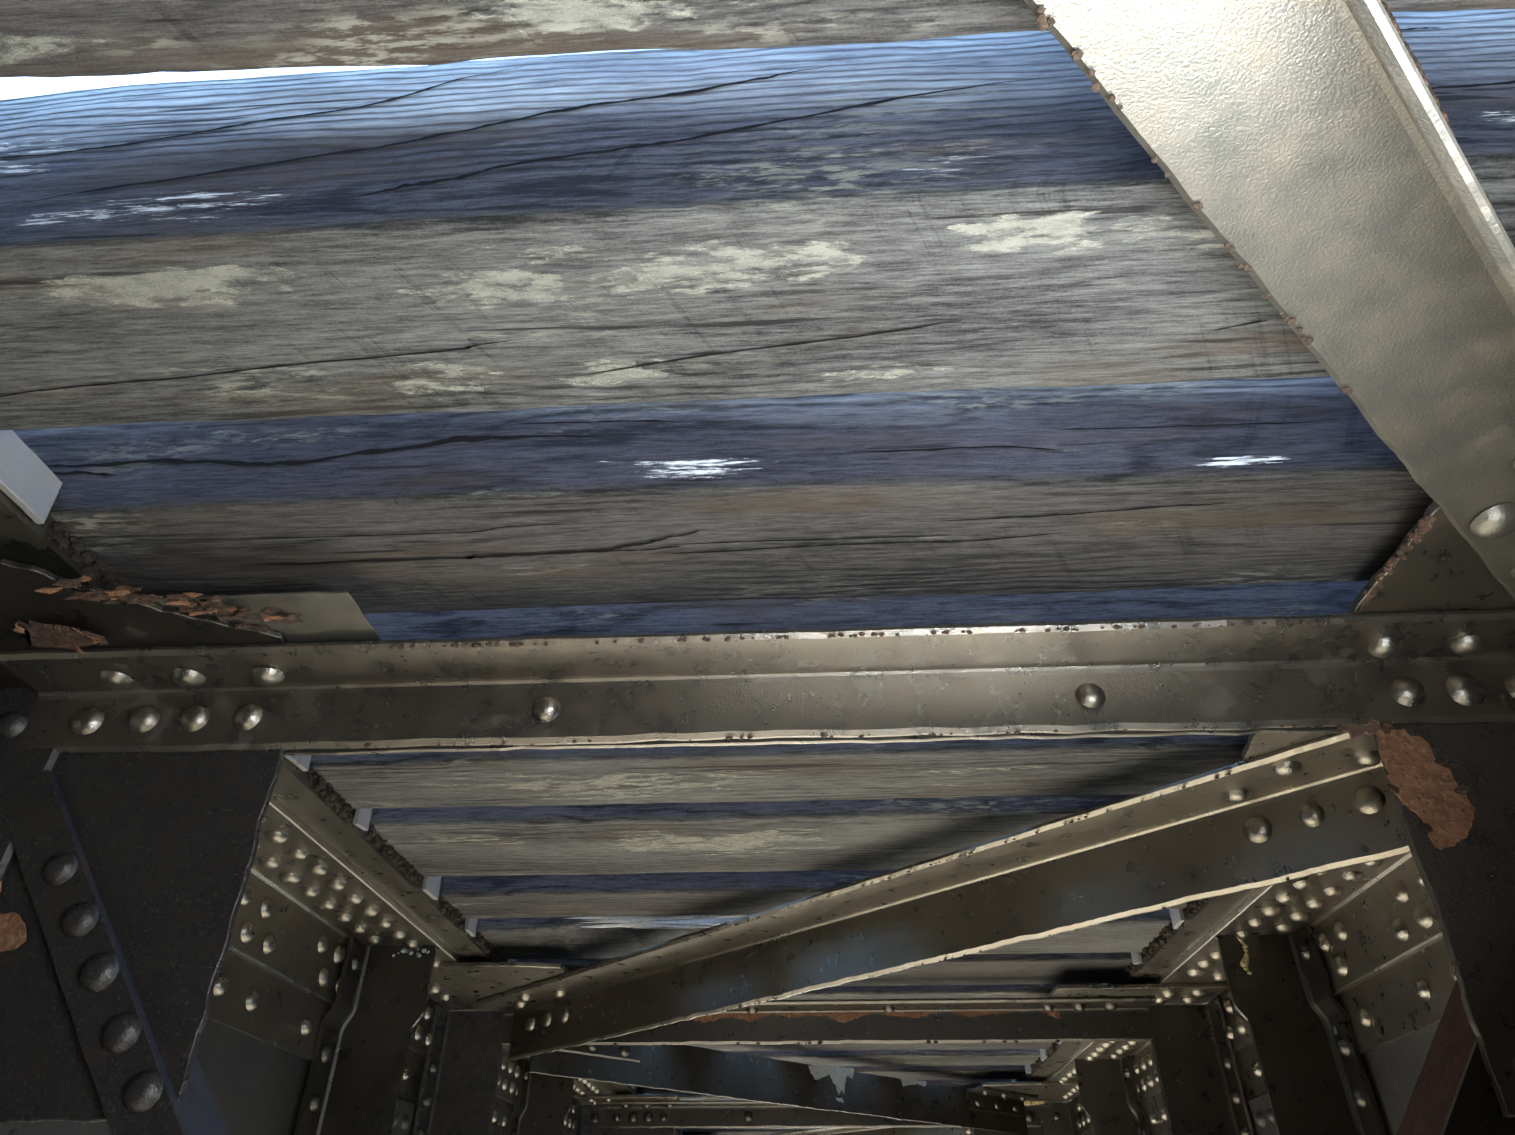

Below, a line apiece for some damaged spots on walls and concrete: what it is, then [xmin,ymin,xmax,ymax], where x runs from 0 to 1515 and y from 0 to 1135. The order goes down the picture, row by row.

rust [34,576,303,633]
rust [13,620,109,653]
rust [1280,719,1476,850]
rust [0,912,26,952]